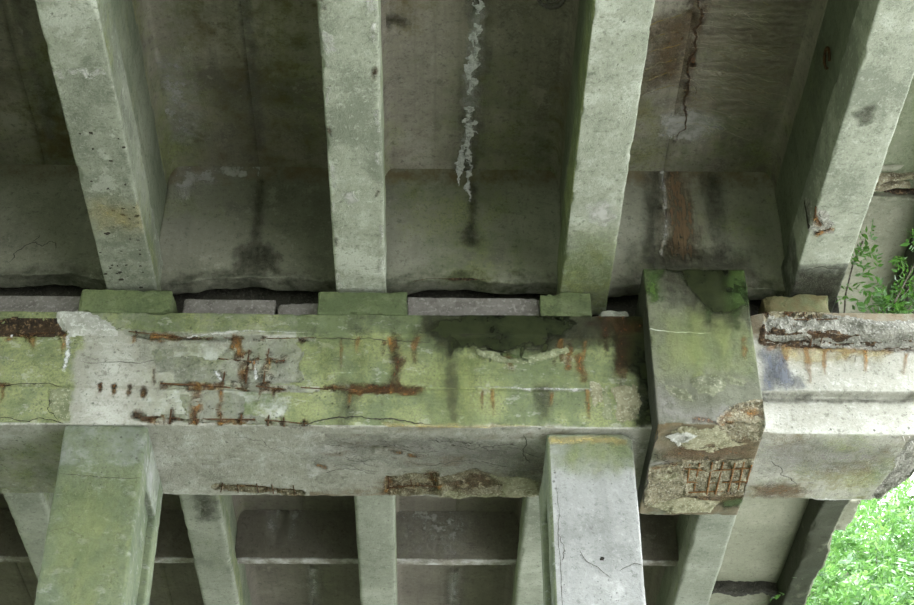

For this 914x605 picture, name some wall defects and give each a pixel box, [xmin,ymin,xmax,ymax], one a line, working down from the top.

crack [673,0,707,141]
damp [454,0,487,212]
spalling [0,311,335,427]
corrosion [323,336,421,403]
peeling [475,346,570,364]
corrosion [766,344,891,370]
spalling [758,311,914,354]
spalling [383,464,540,499]
spalling [644,399,765,514]
spalling [812,436,914,500]